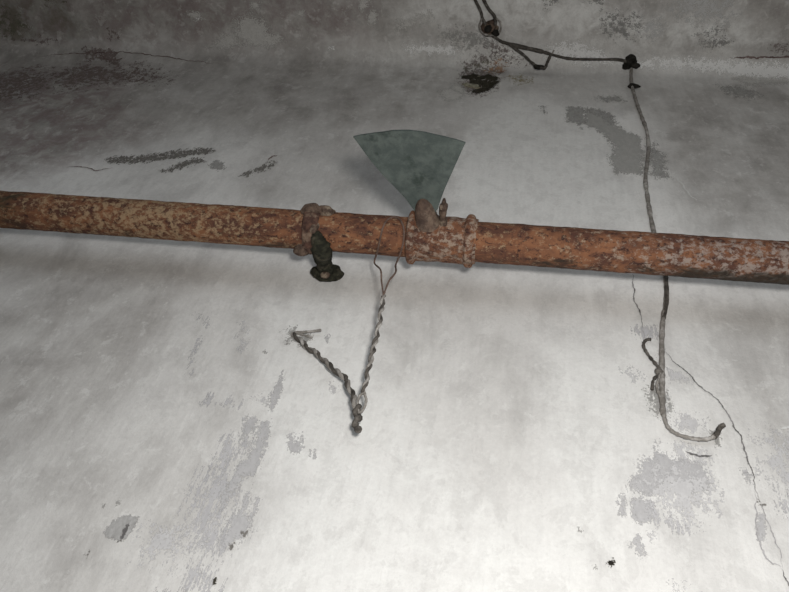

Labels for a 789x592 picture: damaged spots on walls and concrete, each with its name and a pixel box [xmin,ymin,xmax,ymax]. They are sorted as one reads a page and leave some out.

peeling [69,147,225,173]
peeling [238,155,278,178]
peeling [565,95,670,180]
spalling [103,514,139,543]
peeling [615,438,724,556]
crack [668,354,789,586]